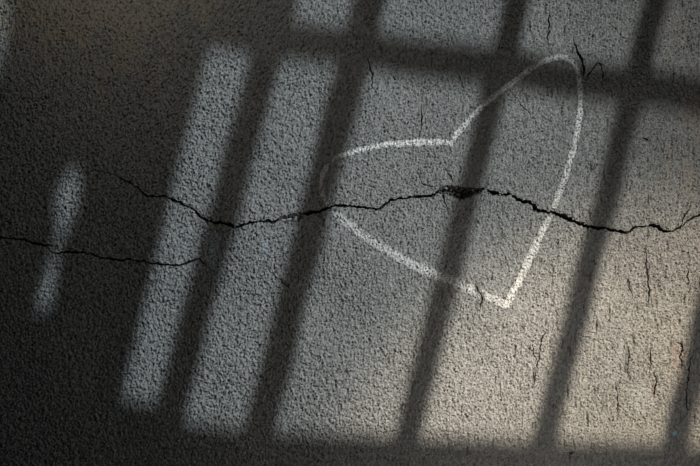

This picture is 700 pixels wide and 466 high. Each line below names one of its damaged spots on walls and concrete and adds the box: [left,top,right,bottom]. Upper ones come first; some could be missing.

crack [573,39,604,83]
crack [90,166,700,234]
crack [0,220,215,271]